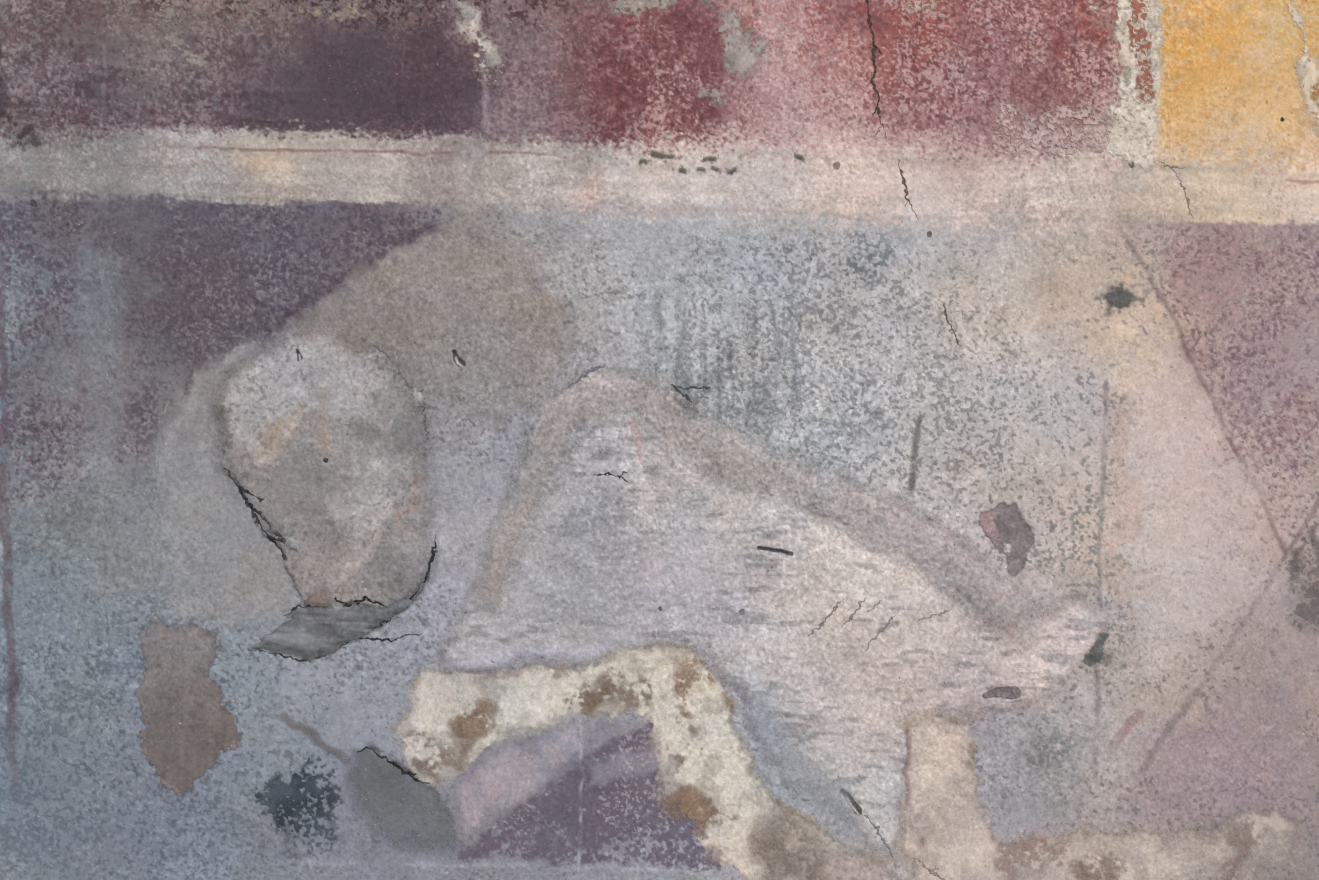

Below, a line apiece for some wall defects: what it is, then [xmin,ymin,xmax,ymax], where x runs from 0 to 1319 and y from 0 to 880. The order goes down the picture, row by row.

peeling [700,0,768,79]
crack [866,0,917,217]
peeling [1288,0,1319,134]
crack [224,468,286,559]
spalling [979,502,1034,576]
crack [259,542,437,662]
spalling [134,619,242,794]
water stain [256,758,340,844]
water stain [282,714,348,762]
spalling [351,640,894,880]
spalling [983,686,1021,702]
spalling [897,712,1298,880]